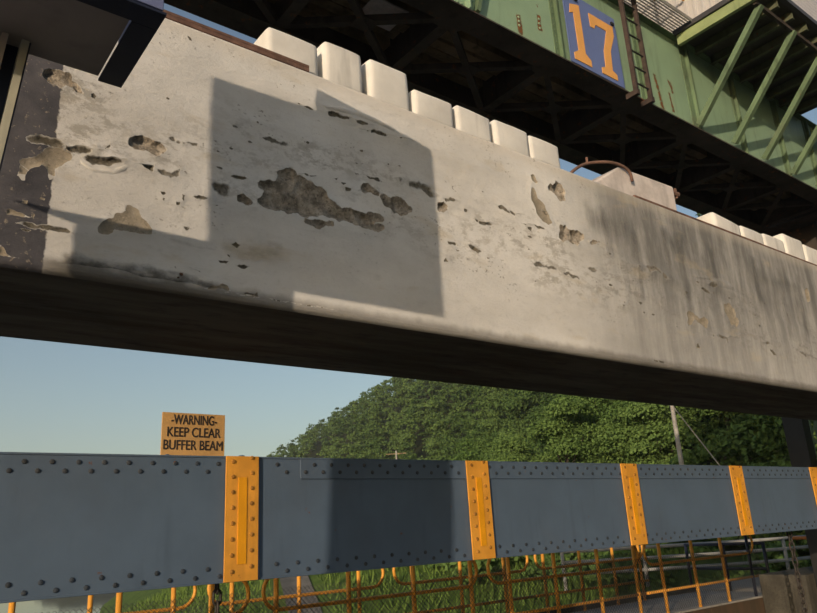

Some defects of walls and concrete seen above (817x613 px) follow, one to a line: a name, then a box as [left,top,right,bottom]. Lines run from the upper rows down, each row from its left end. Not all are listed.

spalling [42,68,97,99]
spalling [128,135,168,156]
peeling [17,146,75,181]
peeling [97,204,156,235]
spalling [211,166,413,233]
spalling [531,174,611,255]